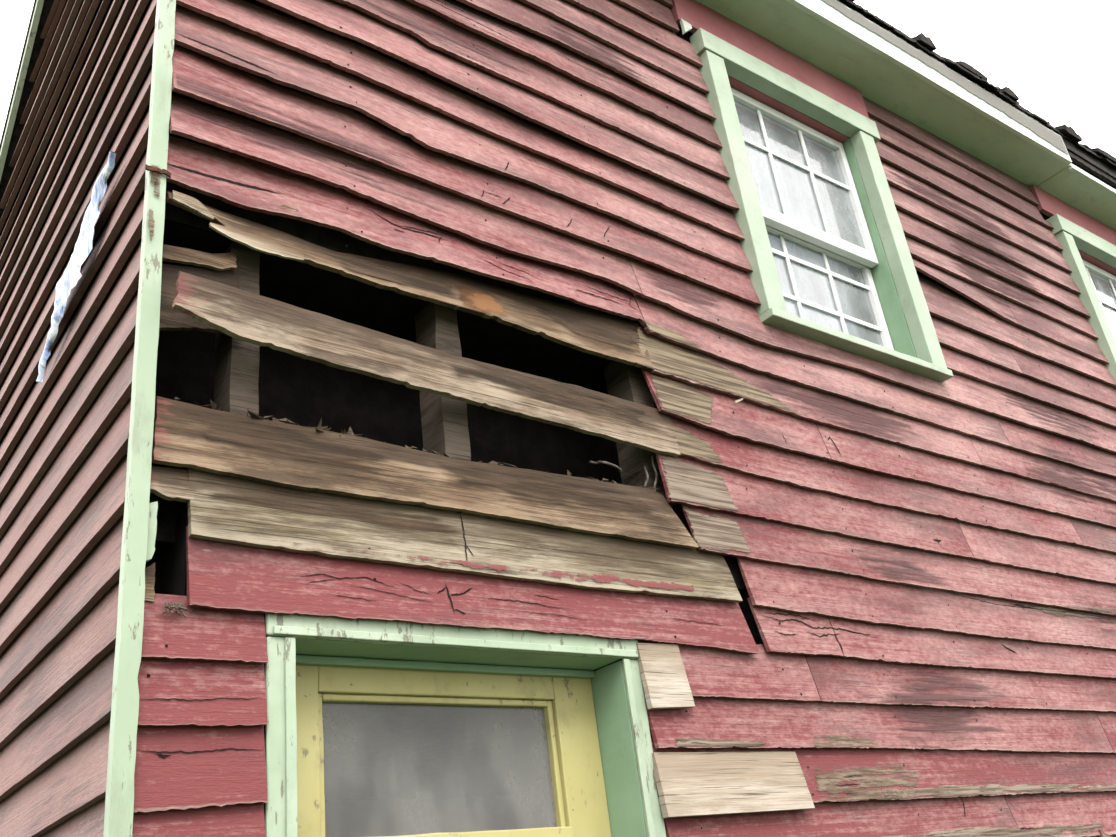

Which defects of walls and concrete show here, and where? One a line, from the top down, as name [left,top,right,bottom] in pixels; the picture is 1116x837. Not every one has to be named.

spalling [111,179,800,553]
spalling [145,501,188,596]
crack [456,512,474,559]
peeling [333,547,694,591]
crack [302,574,585,620]
crack [766,613,873,651]
peeling [815,765,1116,801]
peeling [882,824,1103,837]